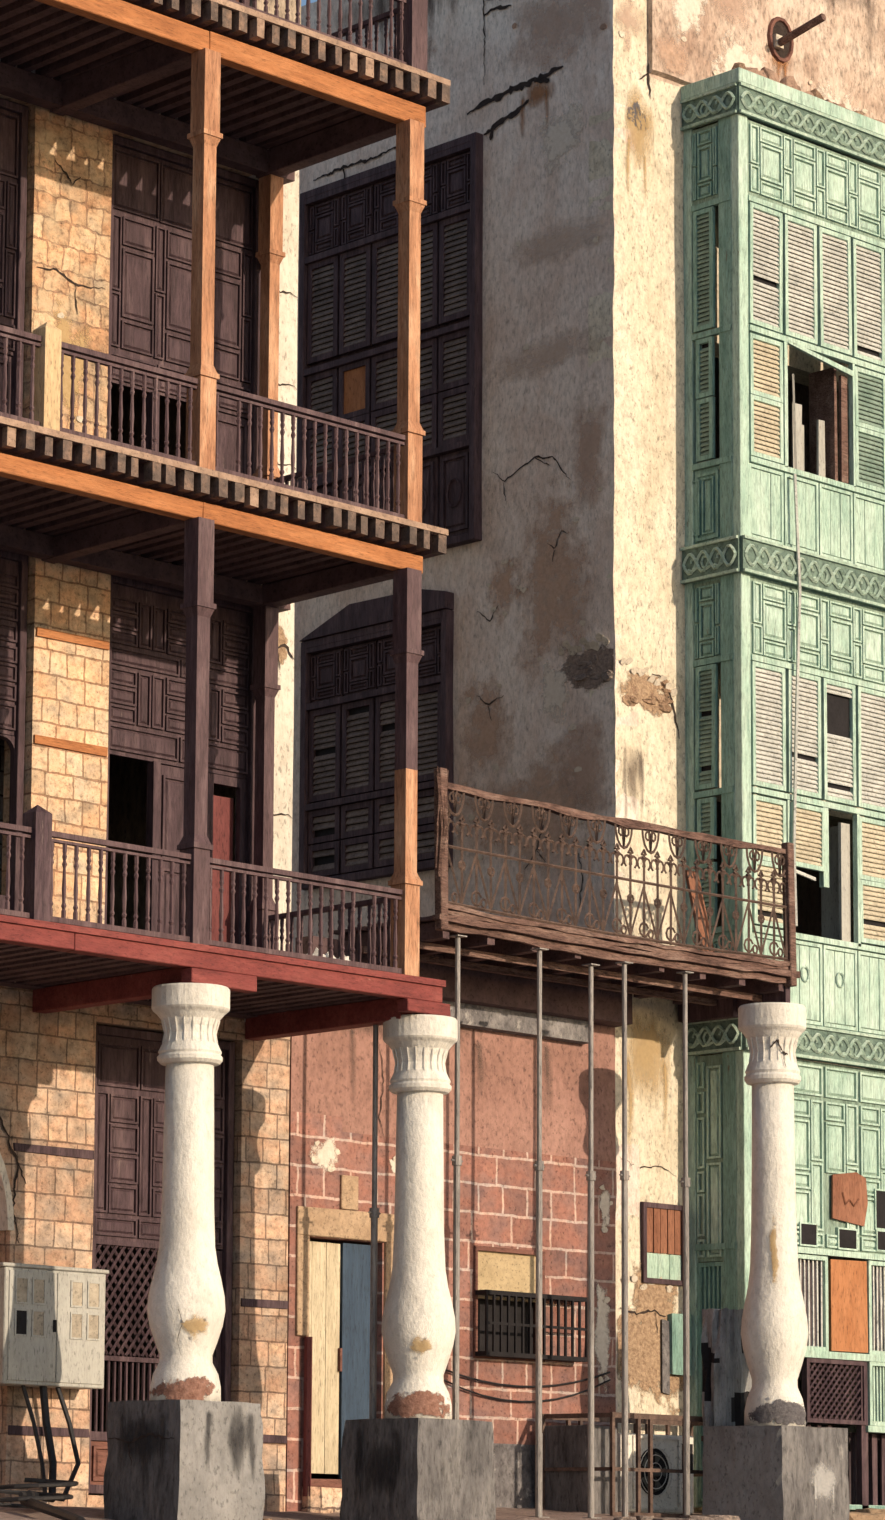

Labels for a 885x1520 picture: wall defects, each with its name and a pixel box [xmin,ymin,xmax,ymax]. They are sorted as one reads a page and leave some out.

crack [467,0,563,140]
flaking render [578,407,603,494]
crack [493,455,570,501]
flaking render [558,633,680,739]
flaking render [310,1138,341,1172]
peeling [149,1376,219,1401]
peeling [383,1390,450,1418]